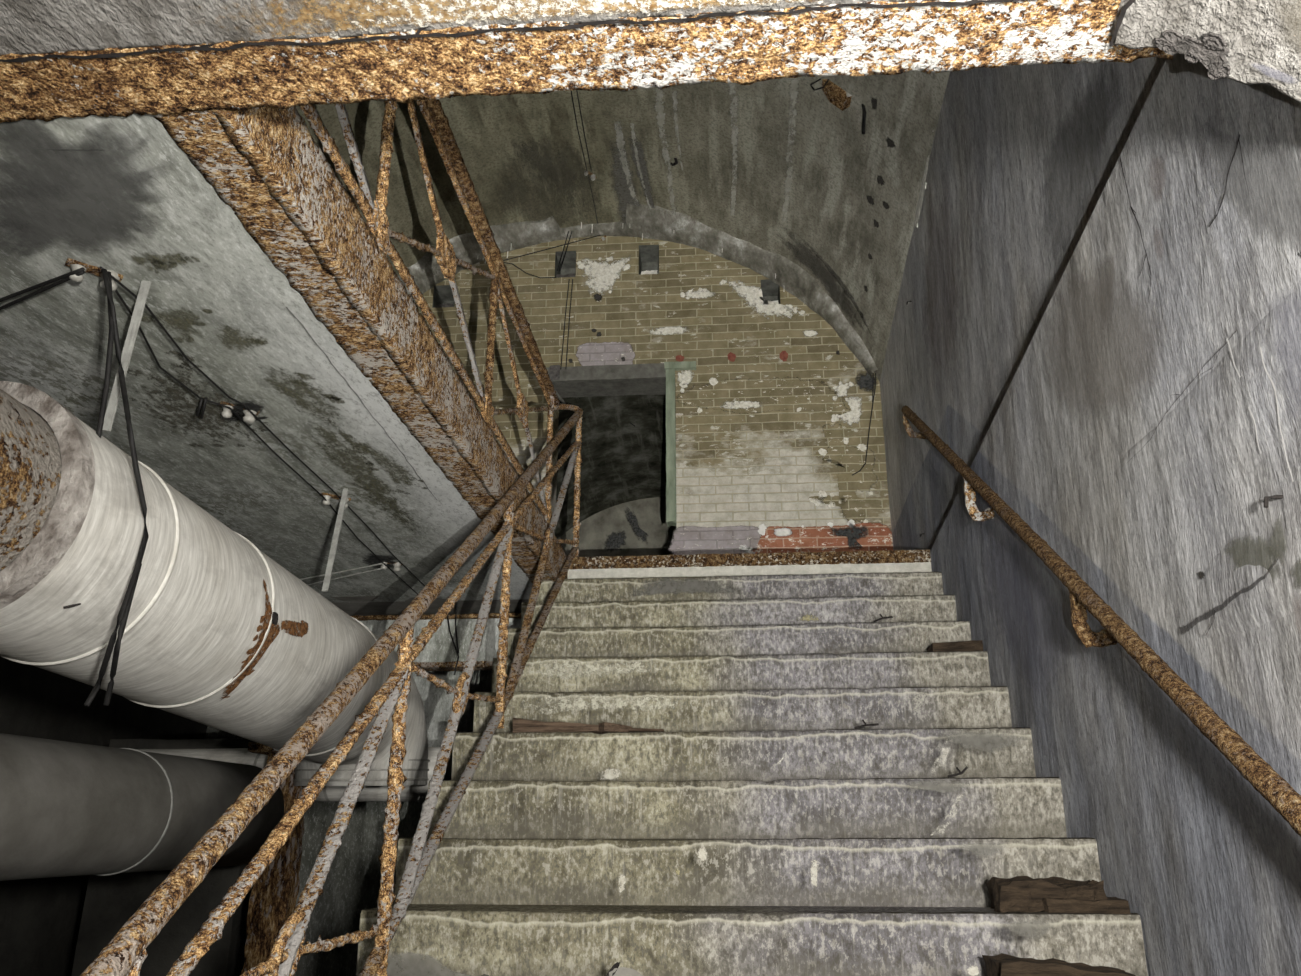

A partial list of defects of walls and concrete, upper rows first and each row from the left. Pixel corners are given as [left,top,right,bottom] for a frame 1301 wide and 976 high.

spalling [1154,29,1231,80]
water stain [611,89,683,222]
water stain [729,83,738,216]
water stain [782,79,799,221]
crack [1209,134,1249,227]
water stain [141,309,267,350]
peeling [398,232,486,300]
peeling [490,204,877,377]
water stain [226,401,267,421]
water stain [265,369,415,531]
peeling [668,355,893,555]
crack [1180,559,1278,635]